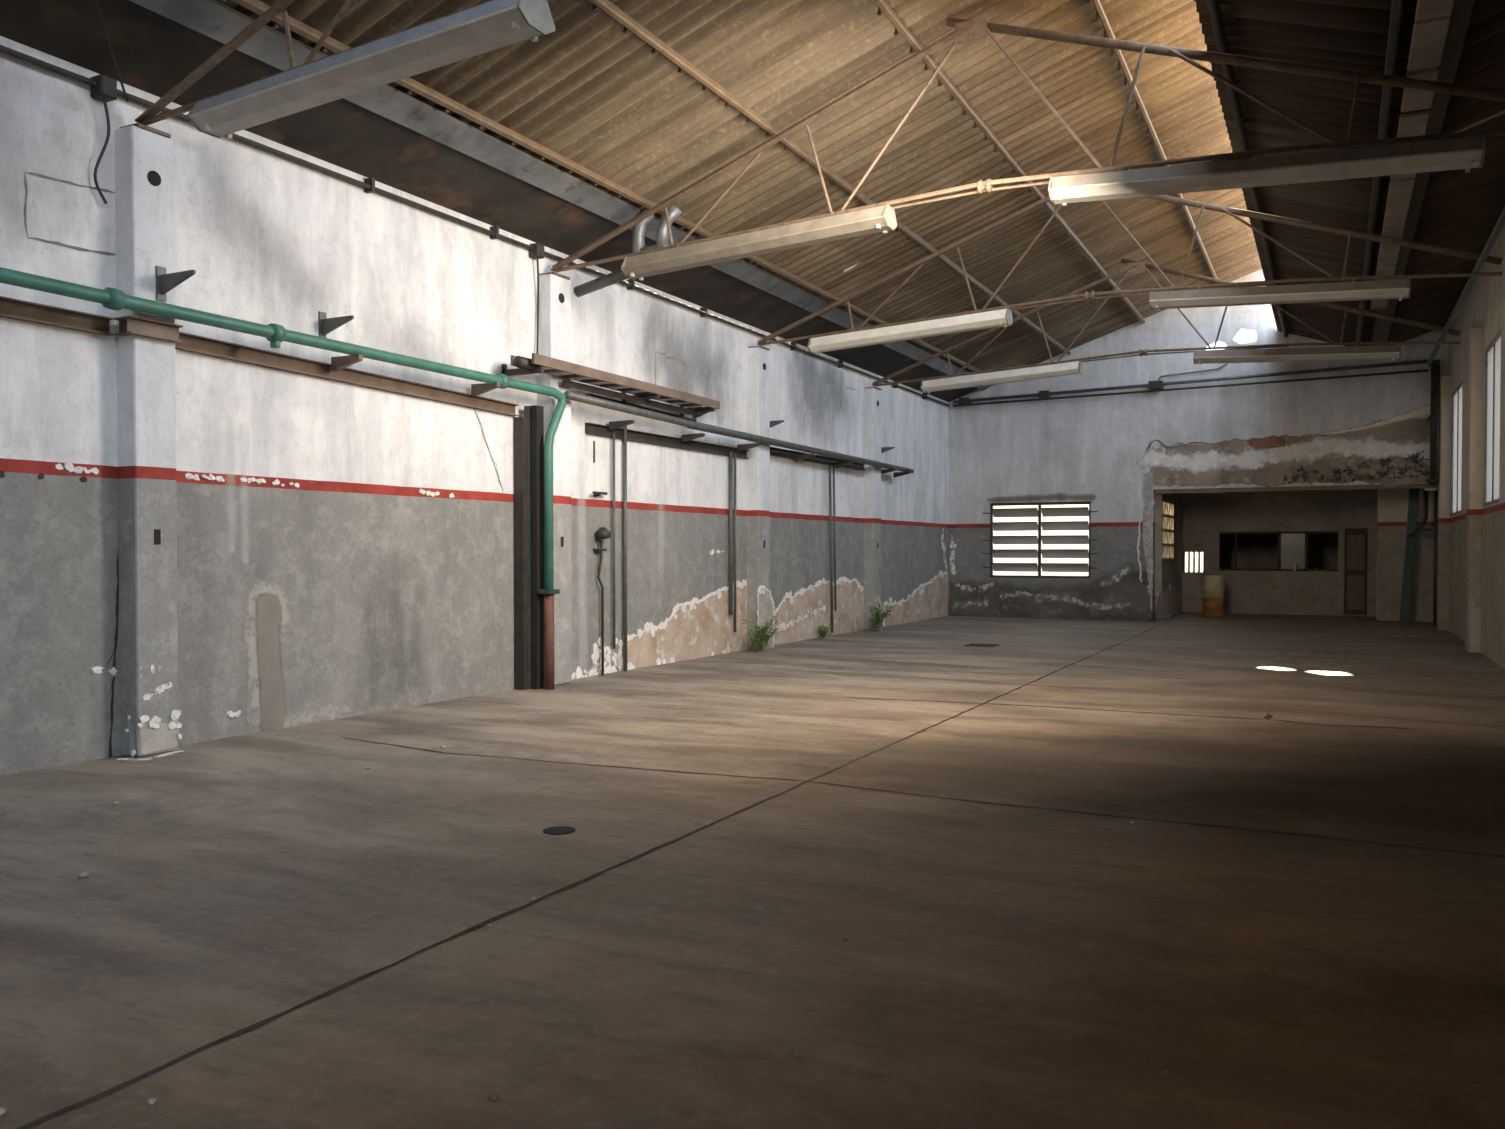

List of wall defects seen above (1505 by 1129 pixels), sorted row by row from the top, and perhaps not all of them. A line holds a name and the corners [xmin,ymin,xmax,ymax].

flaking render [1138,404,1430,611]
peeling [91,666,117,676]
peeling [125,664,182,757]
flaking render [572,528,957,679]